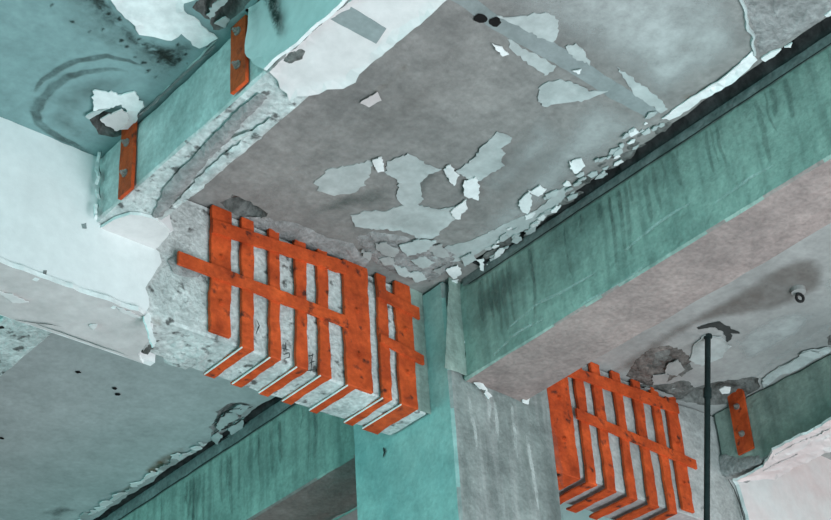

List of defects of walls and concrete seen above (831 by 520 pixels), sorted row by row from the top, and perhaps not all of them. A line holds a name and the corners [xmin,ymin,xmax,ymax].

damp [154,44,187,64]
peeling [111,0,250,49]
peeling [85,89,144,137]
spalling [153,93,278,218]
peeling [220,0,831,284]
spalling [168,254,201,277]
spalling [626,335,831,405]
peeling [78,402,253,520]